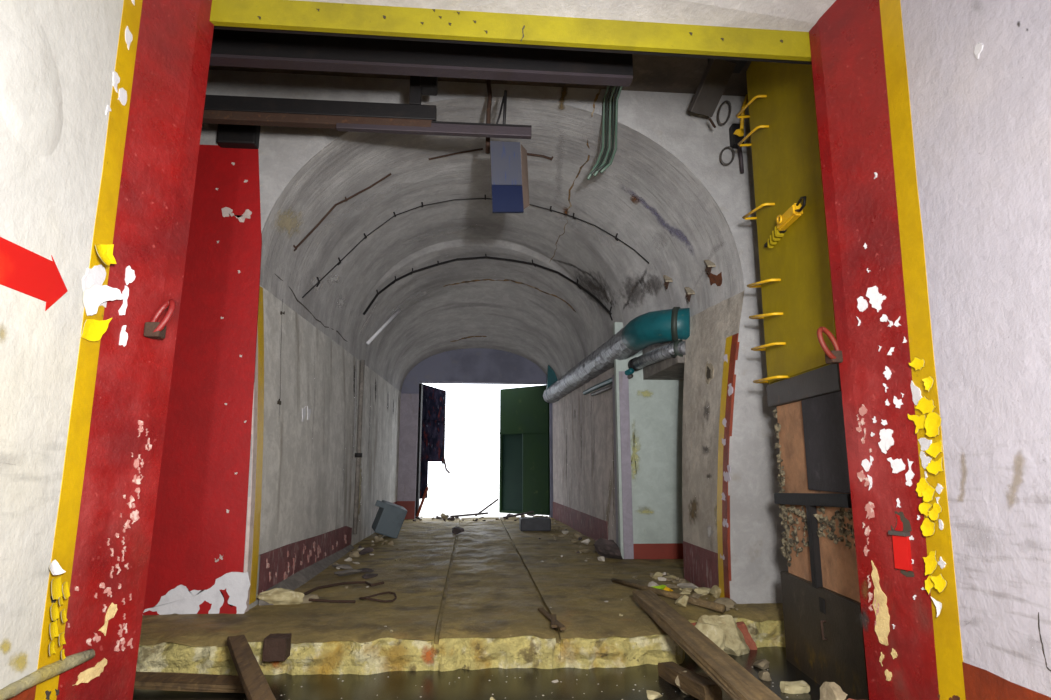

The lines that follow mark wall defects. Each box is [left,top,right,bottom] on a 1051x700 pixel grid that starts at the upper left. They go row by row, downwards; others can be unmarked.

peeling [222,207,252,222]
crack [549,89,601,263]
peeling [81,244,135,347]
peeling [773,286,947,681]
peeling [49,560,79,661]
peeling [72,420,152,686]
spalling [143,572,250,615]
peeling [262,535,347,591]